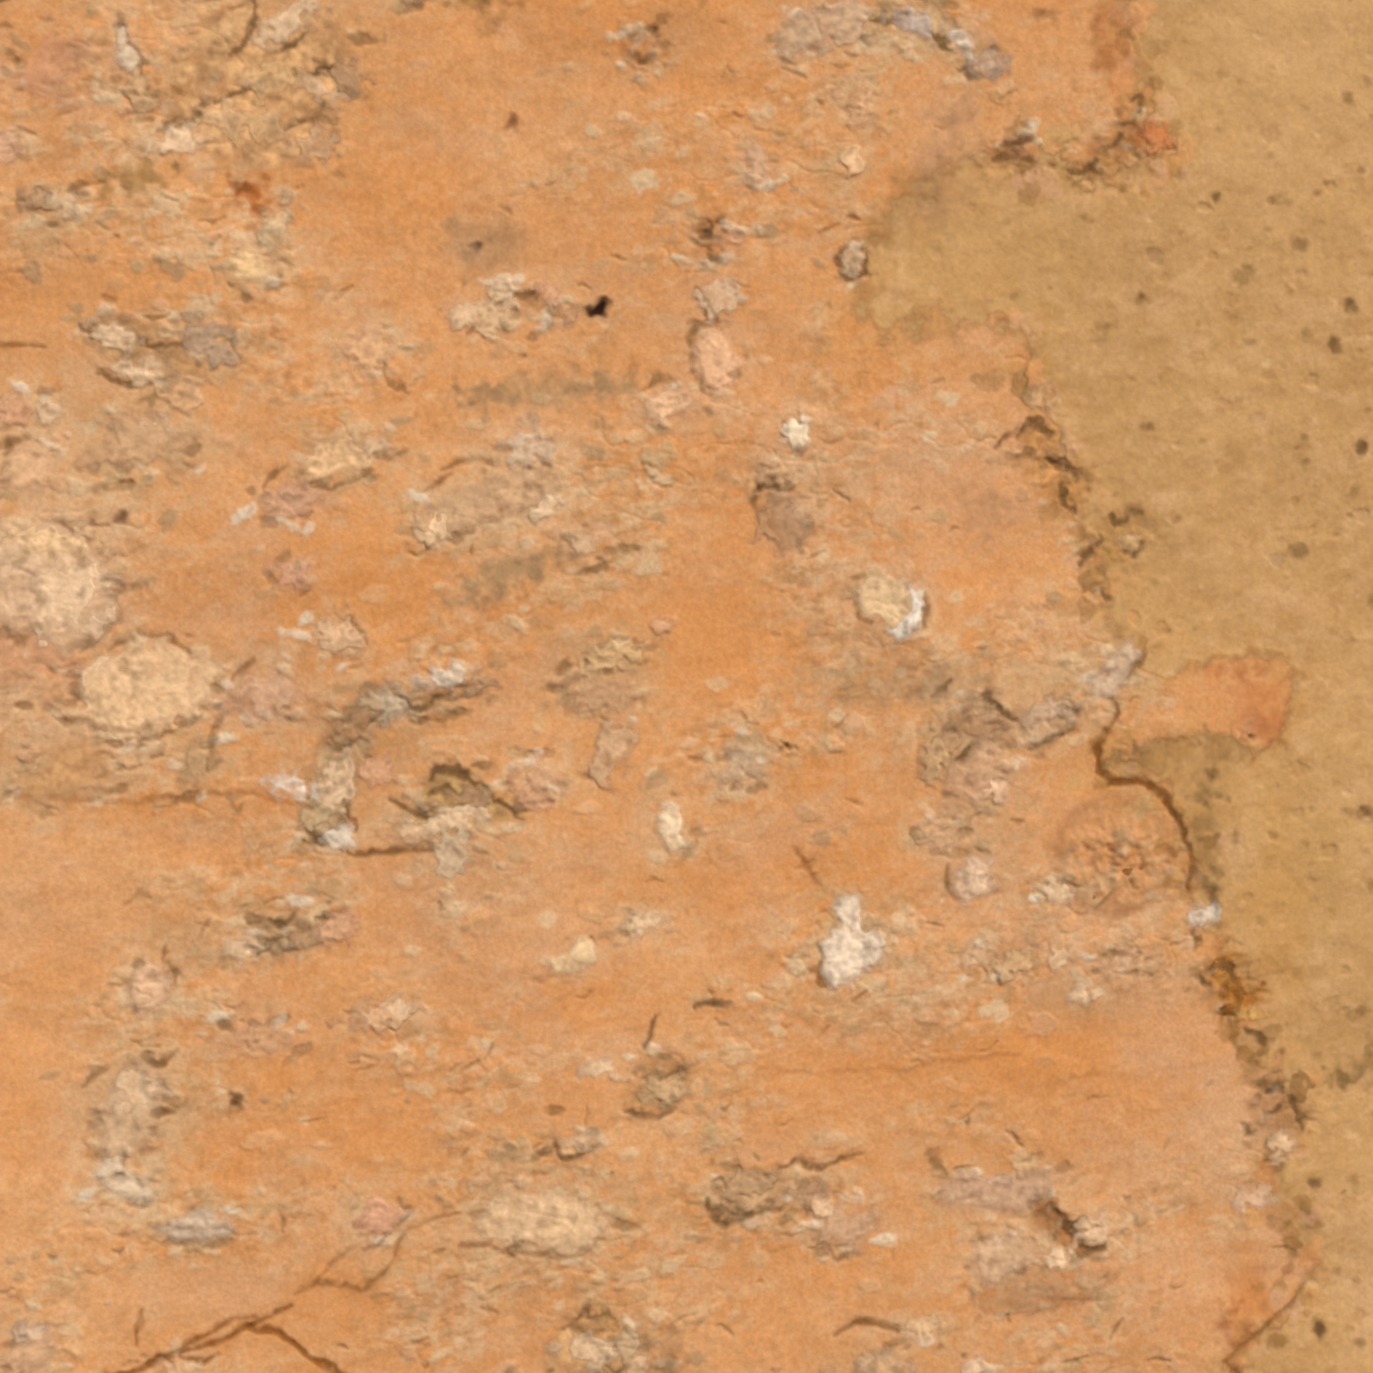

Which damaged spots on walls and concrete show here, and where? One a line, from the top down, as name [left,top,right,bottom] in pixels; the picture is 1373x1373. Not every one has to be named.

spalling [781,0,1012,78]
peeling [838,0,1373,1373]
crack [1094,742,1190,847]
peeling [818,895,885,988]
spalling [706,1156,878,1243]
crack [119,1305,335,1373]